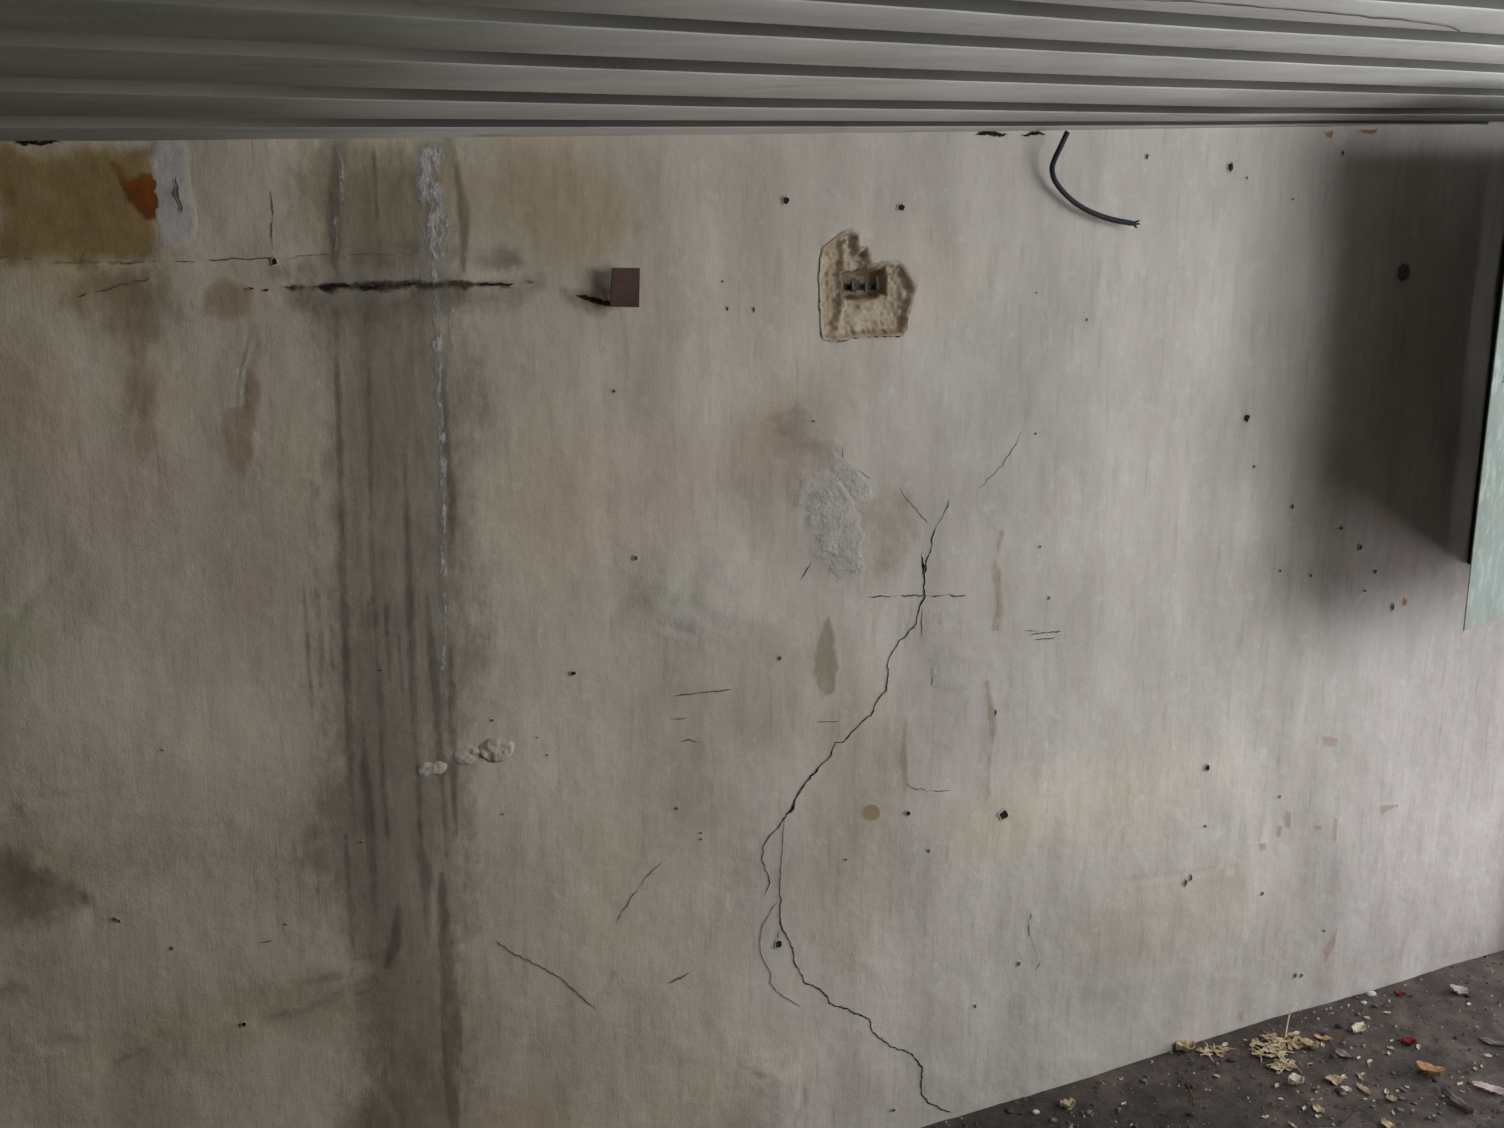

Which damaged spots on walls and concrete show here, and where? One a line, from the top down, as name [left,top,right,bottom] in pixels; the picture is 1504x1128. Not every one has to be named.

leakage [0,141,177,288]
rust [121,175,158,219]
spalling [819,230,916,342]
leakage [192,137,529,1128]
crack [759,449,968,1112]